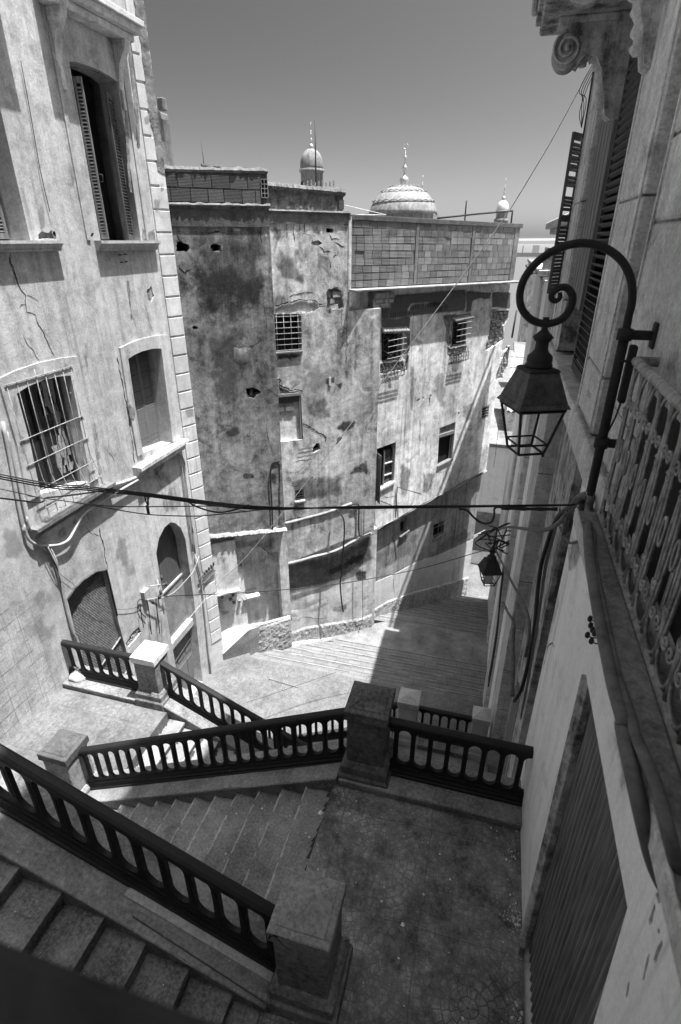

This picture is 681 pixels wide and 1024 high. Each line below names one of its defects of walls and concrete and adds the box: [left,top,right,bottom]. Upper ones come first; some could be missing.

crack [9,254,54,360]
spalling [326,289,344,310]